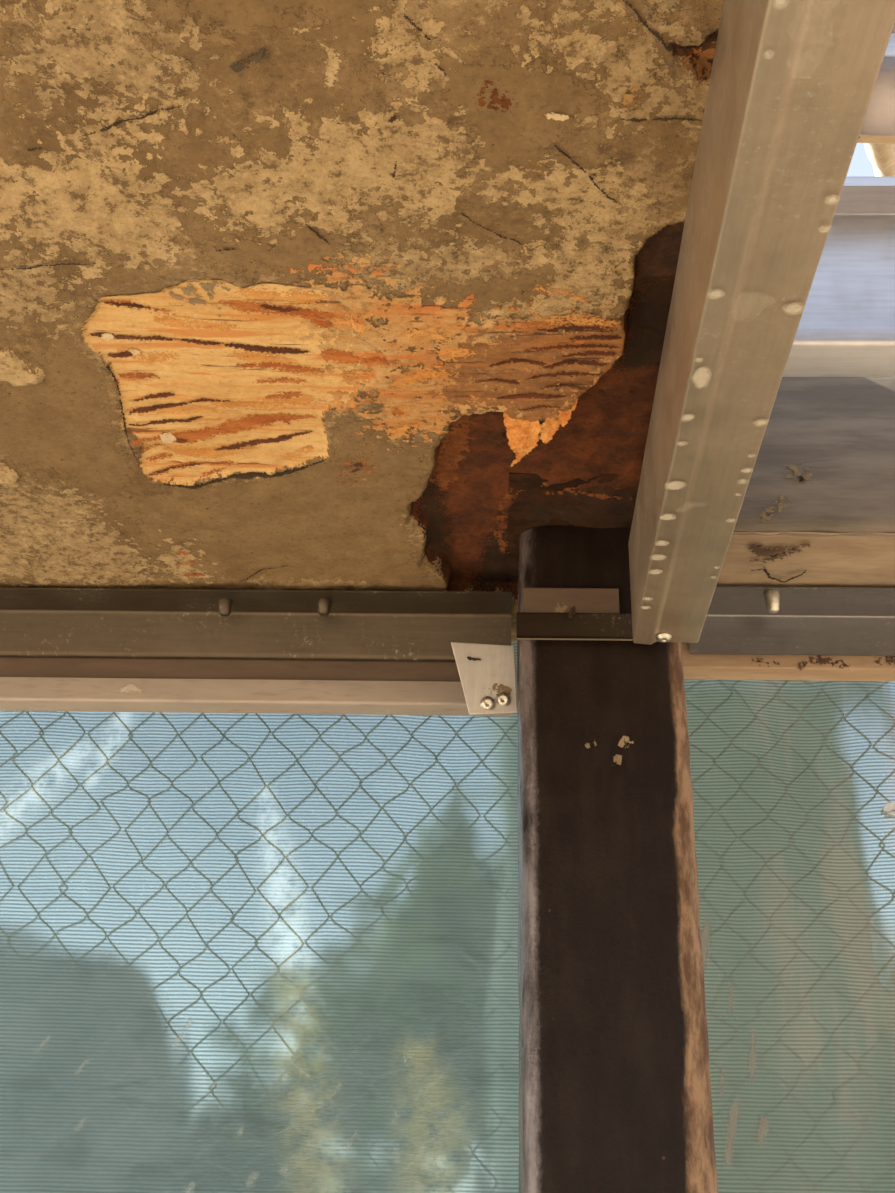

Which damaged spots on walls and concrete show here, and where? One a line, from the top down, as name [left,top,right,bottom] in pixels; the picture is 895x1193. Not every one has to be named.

peeling [0,0,720,604]
rust [274,252,626,483]